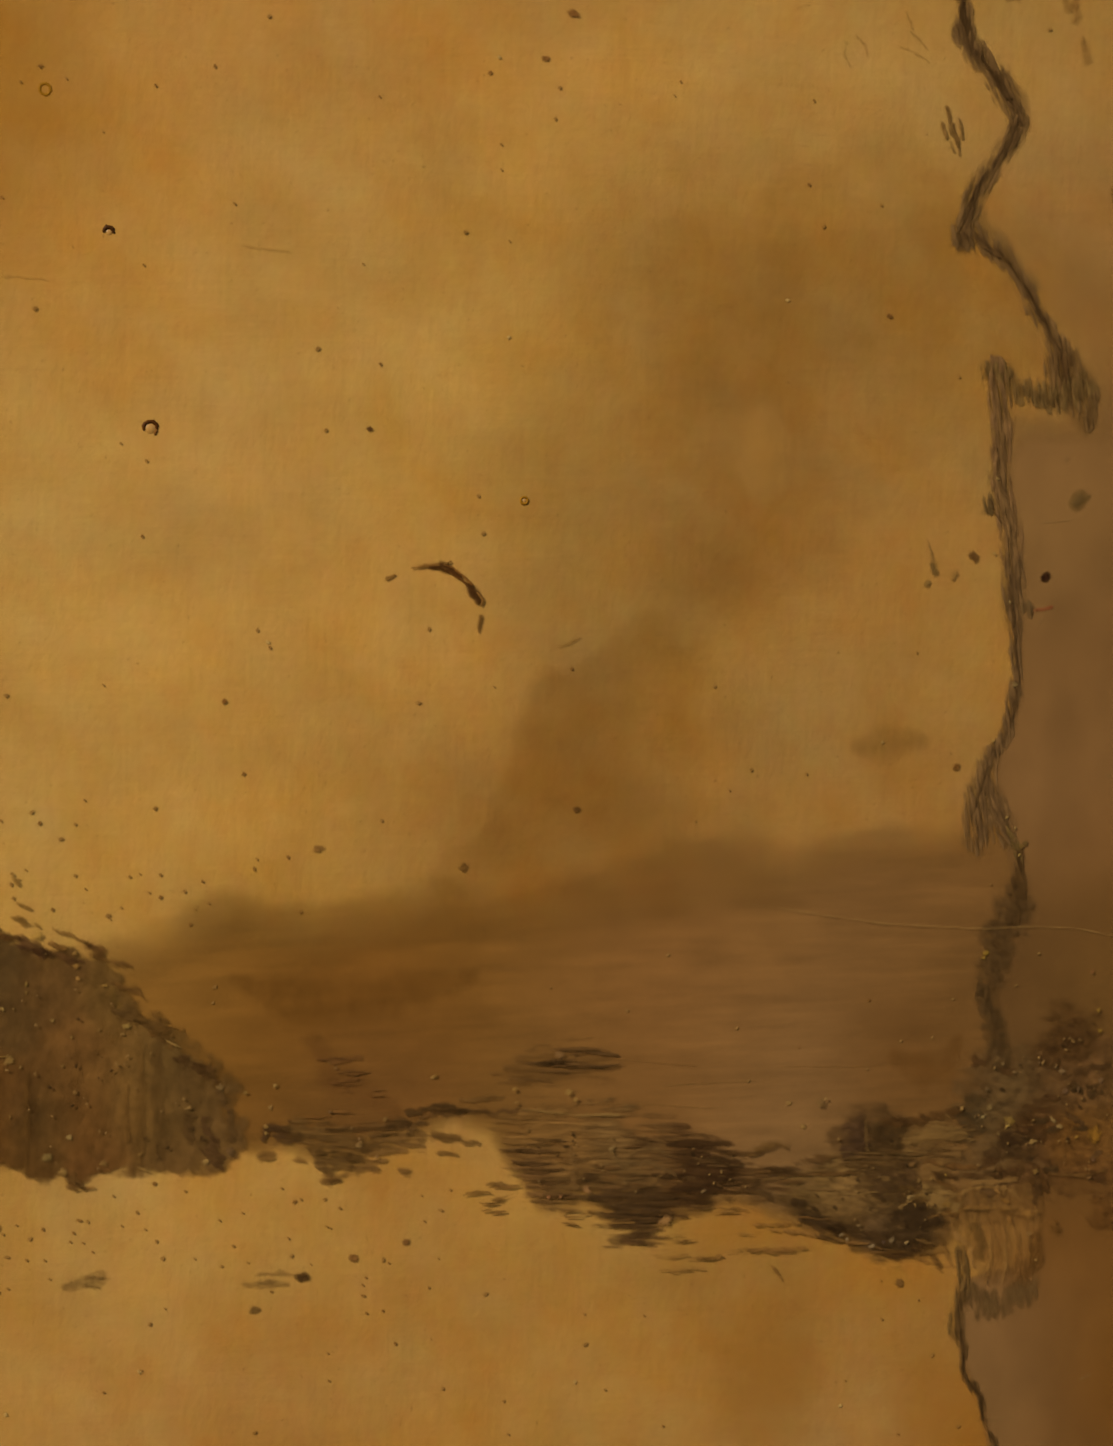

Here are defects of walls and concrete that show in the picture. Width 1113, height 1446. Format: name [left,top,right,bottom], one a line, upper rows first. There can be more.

peeling [0,869,247,1191]
leakage [116,397,1113,1446]
crack [948,1243,1039,1446]
crack [951,0,1100,1103]